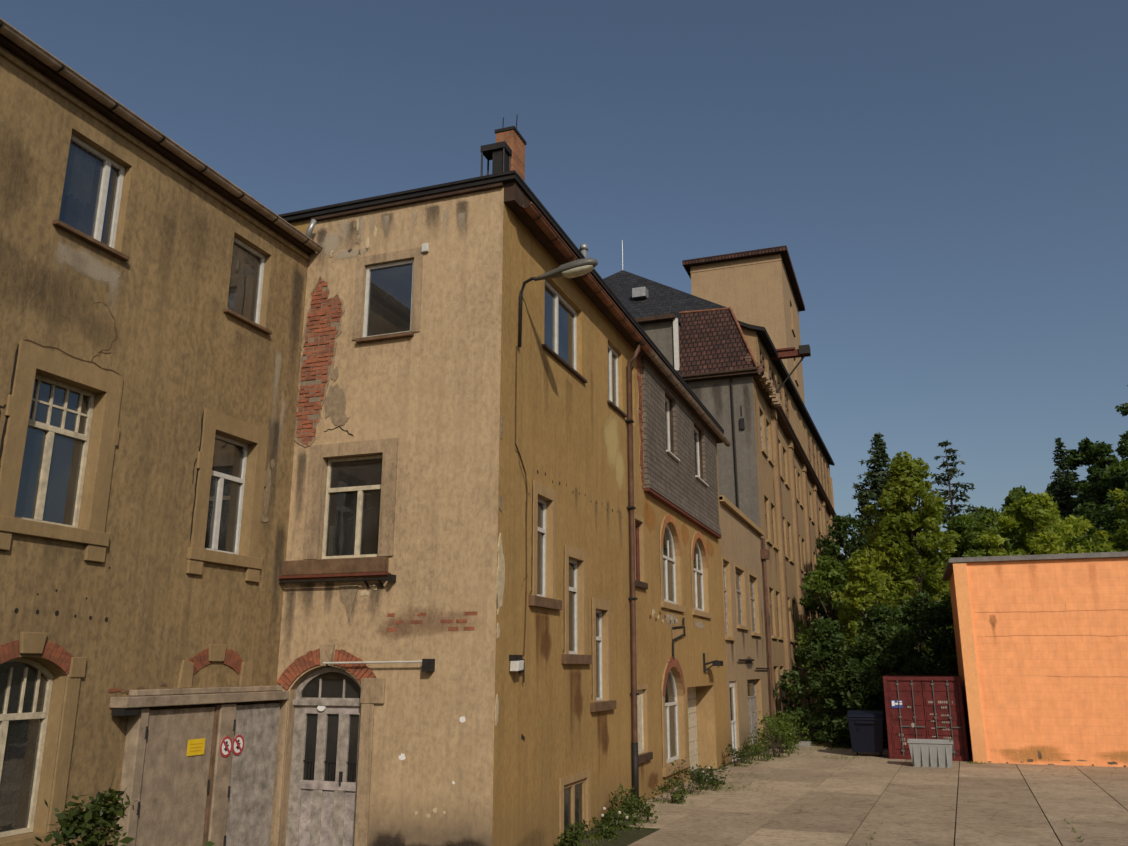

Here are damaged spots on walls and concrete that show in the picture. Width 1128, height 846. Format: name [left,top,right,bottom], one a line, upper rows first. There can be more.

crack [0,270,124,467]
flaking render [294,275,348,447]
flaking render [440,611,477,630]